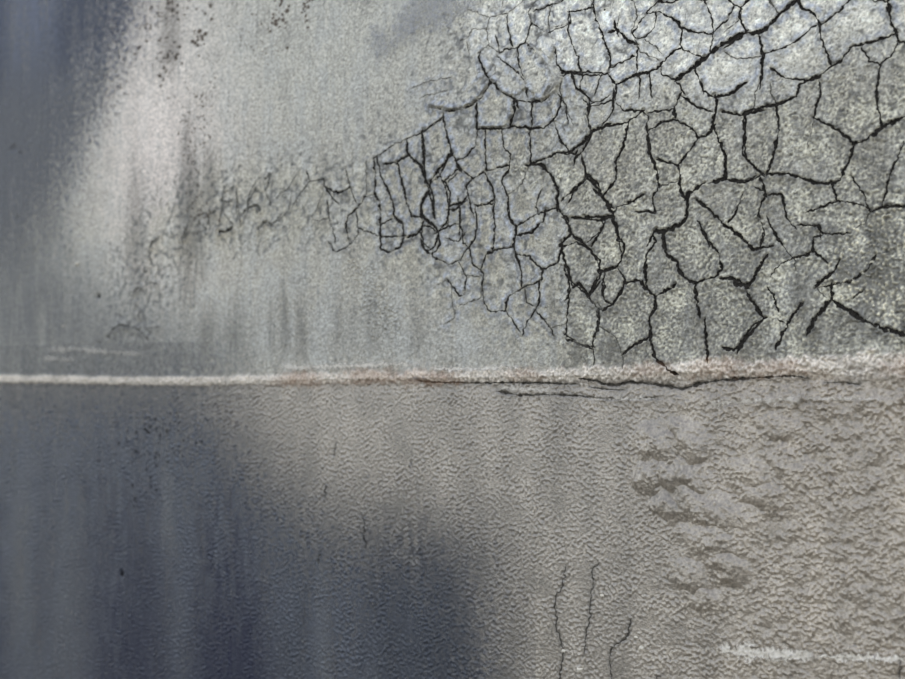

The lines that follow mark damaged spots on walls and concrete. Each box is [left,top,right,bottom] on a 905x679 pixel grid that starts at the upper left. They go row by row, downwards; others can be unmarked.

damp [0,0,155,374]
crack [109,0,905,400]
damp [0,369,500,679]